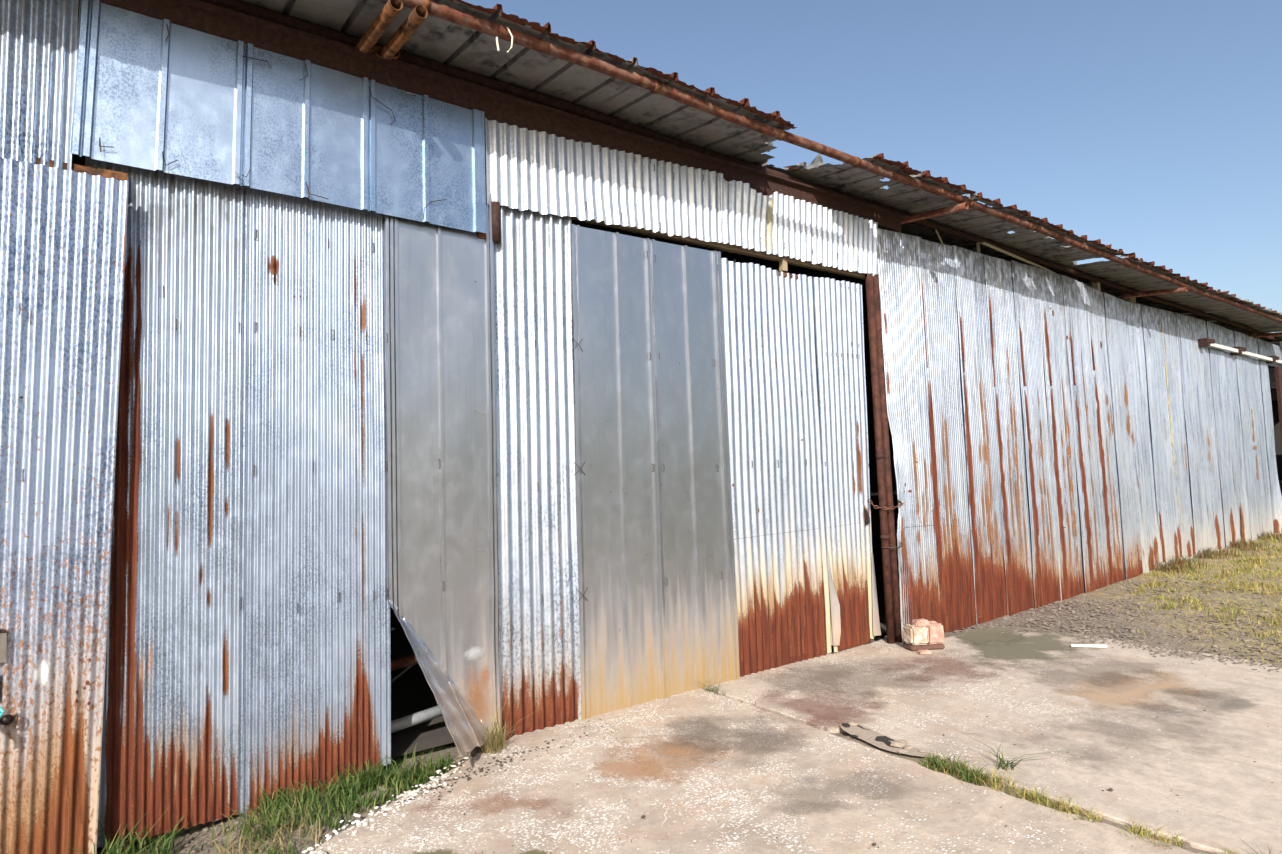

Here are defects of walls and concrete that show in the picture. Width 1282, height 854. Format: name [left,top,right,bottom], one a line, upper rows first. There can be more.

corrosion [0,214,381,854]
corrosion [502,661,579,740]
corrosion [738,548,870,677]
corrosion [901,281,1245,633]